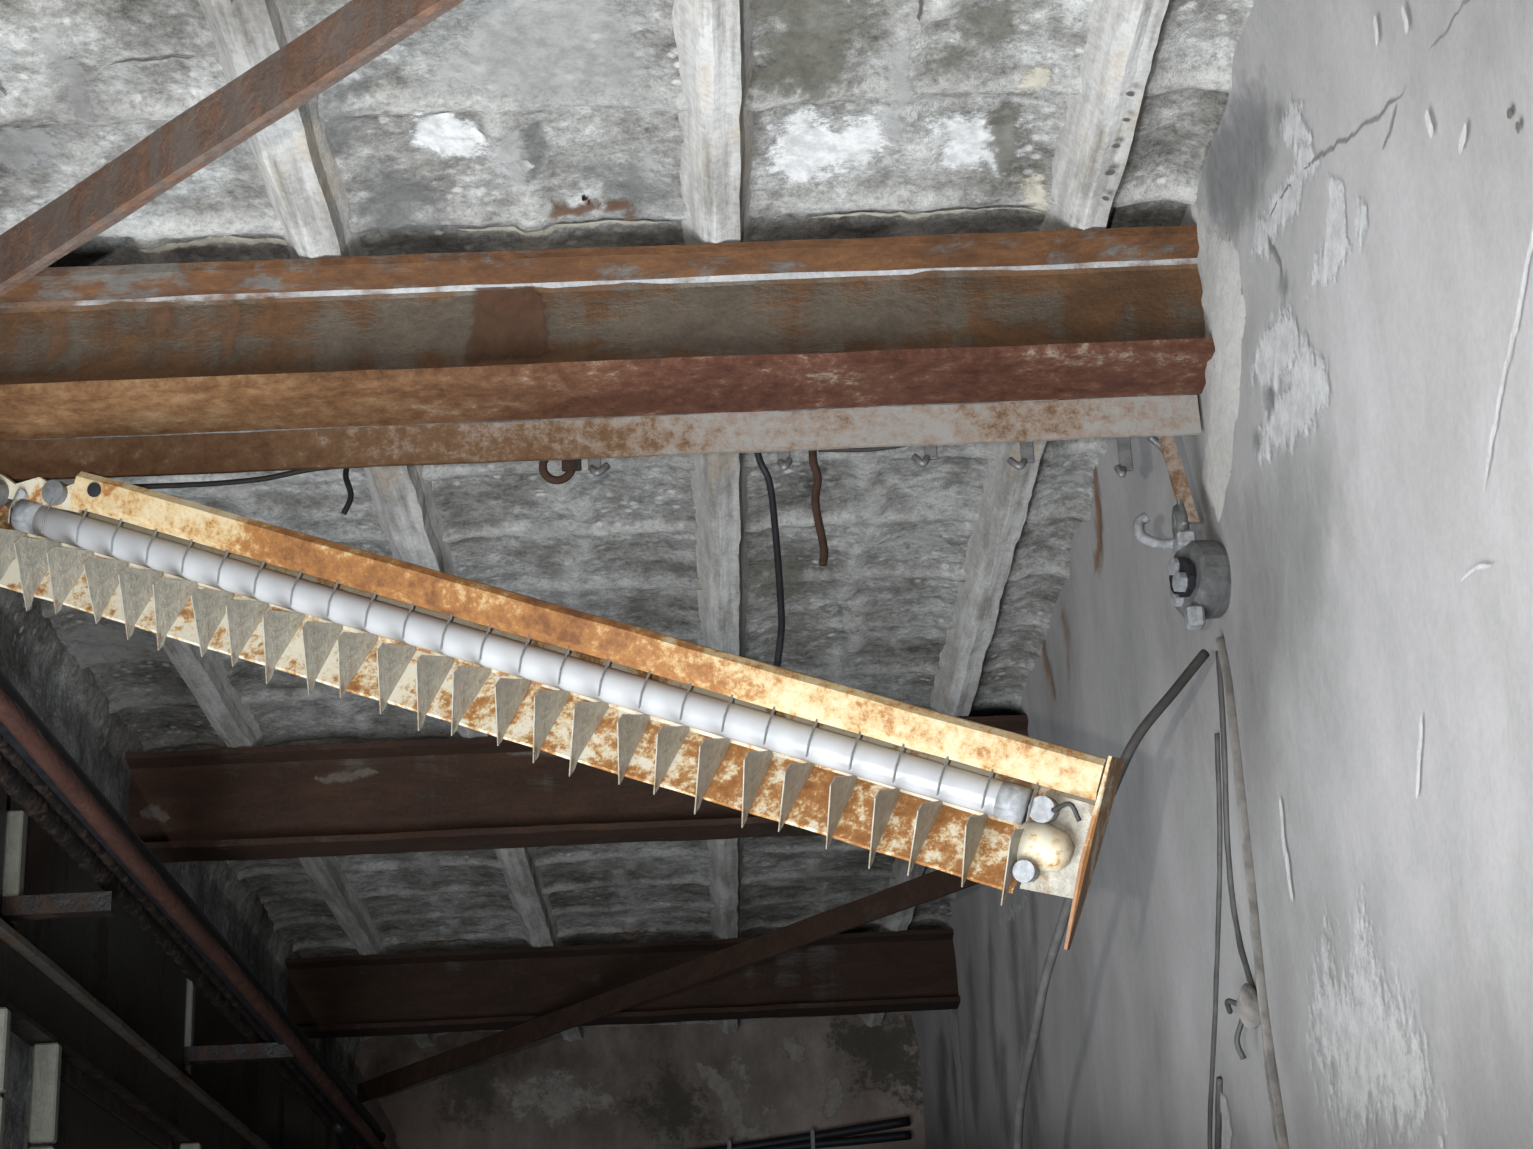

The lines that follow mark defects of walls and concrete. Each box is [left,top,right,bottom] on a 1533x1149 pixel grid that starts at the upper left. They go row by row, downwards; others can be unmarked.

leakage [140,235,288,253]
rust [466,286,549,362]
leakage [411,0,663,189]
leakage [459,220,661,237]
leakage [749,0,912,186]
leakage [811,65,1052,219]
leakage [1207,100,1368,286]
crack [1268,95,1402,280]
crack [1432,0,1469,46]
leakage [1313,910,1428,1134]